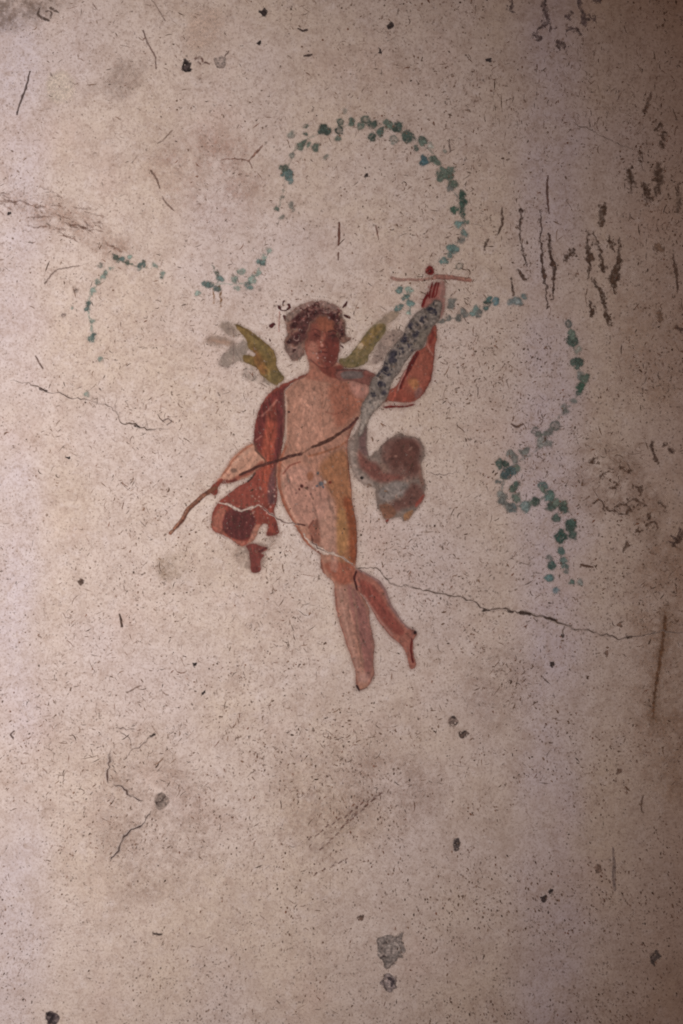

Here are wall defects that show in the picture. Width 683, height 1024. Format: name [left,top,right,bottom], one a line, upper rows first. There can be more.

crack [14,380,172,431]
crack [219,502,683,641]
crack [105,727,155,860]
spalling [377,933,406,992]